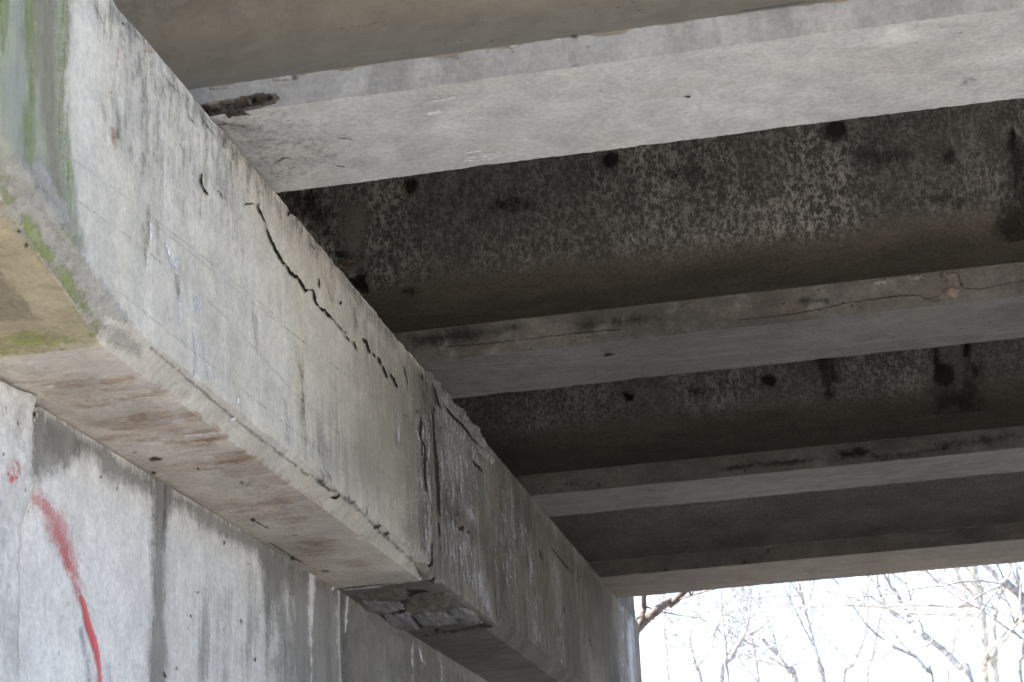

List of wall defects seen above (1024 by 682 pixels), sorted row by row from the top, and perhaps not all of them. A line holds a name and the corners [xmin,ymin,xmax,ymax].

spalling [200,75,296,119]
crack [741,275,1024,320]
crack [168,81,492,636]
crack [447,329,620,357]
water stain [33,411,423,682]
water stain [416,394,541,644]
peeling [358,600,483,631]
water stain [619,607,636,682]